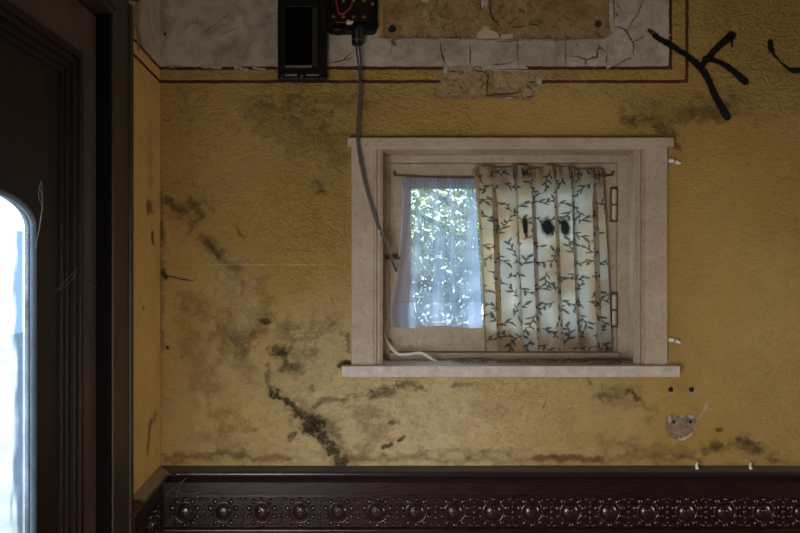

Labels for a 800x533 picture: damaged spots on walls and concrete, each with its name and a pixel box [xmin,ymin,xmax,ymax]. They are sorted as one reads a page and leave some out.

crack [469,40,519,67]
spalling [379,0,613,40]
crack [565,0,644,69]
spalling [436,65,542,99]
water stain [270,389,348,466]
spalling [666,403,709,441]